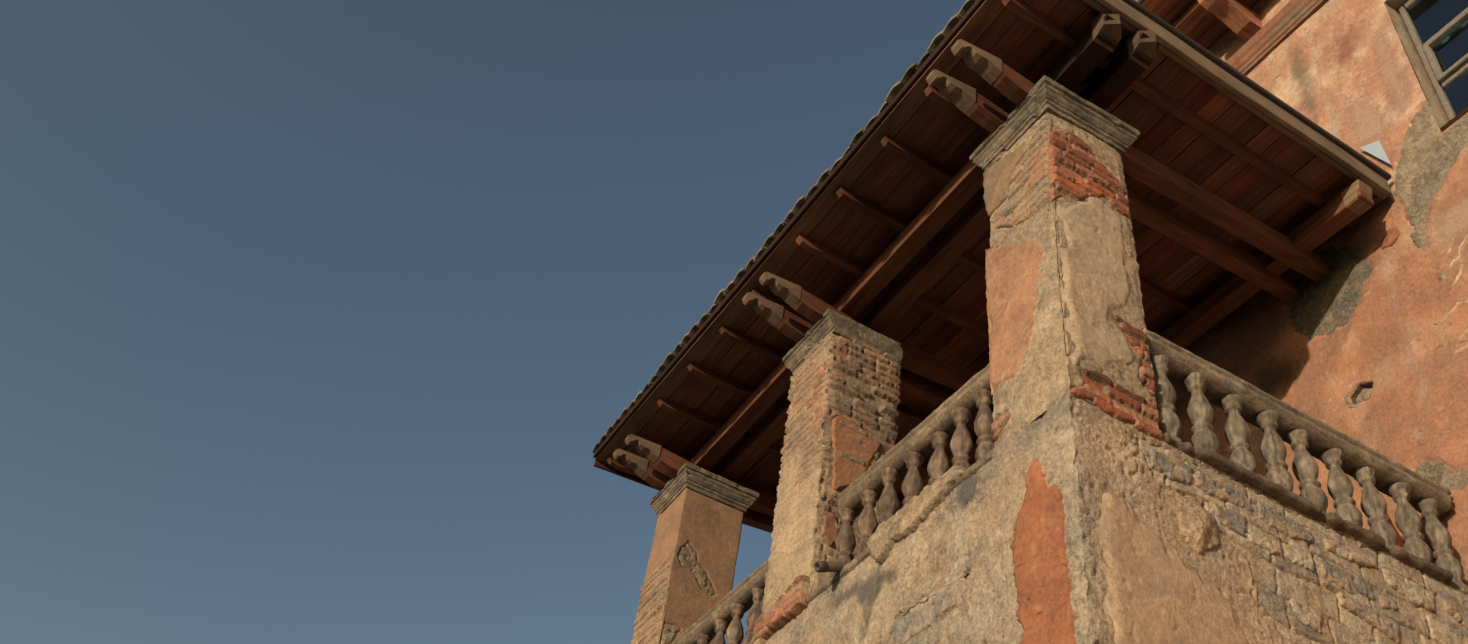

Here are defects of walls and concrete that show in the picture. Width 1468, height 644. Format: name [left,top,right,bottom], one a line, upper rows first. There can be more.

spalling [991,116,1130,229]
spalling [1289,103,1468,340]
spalling [885,569,966,644]
peeling [1010,458,1077,644]
spalling [1069,315,1468,644]